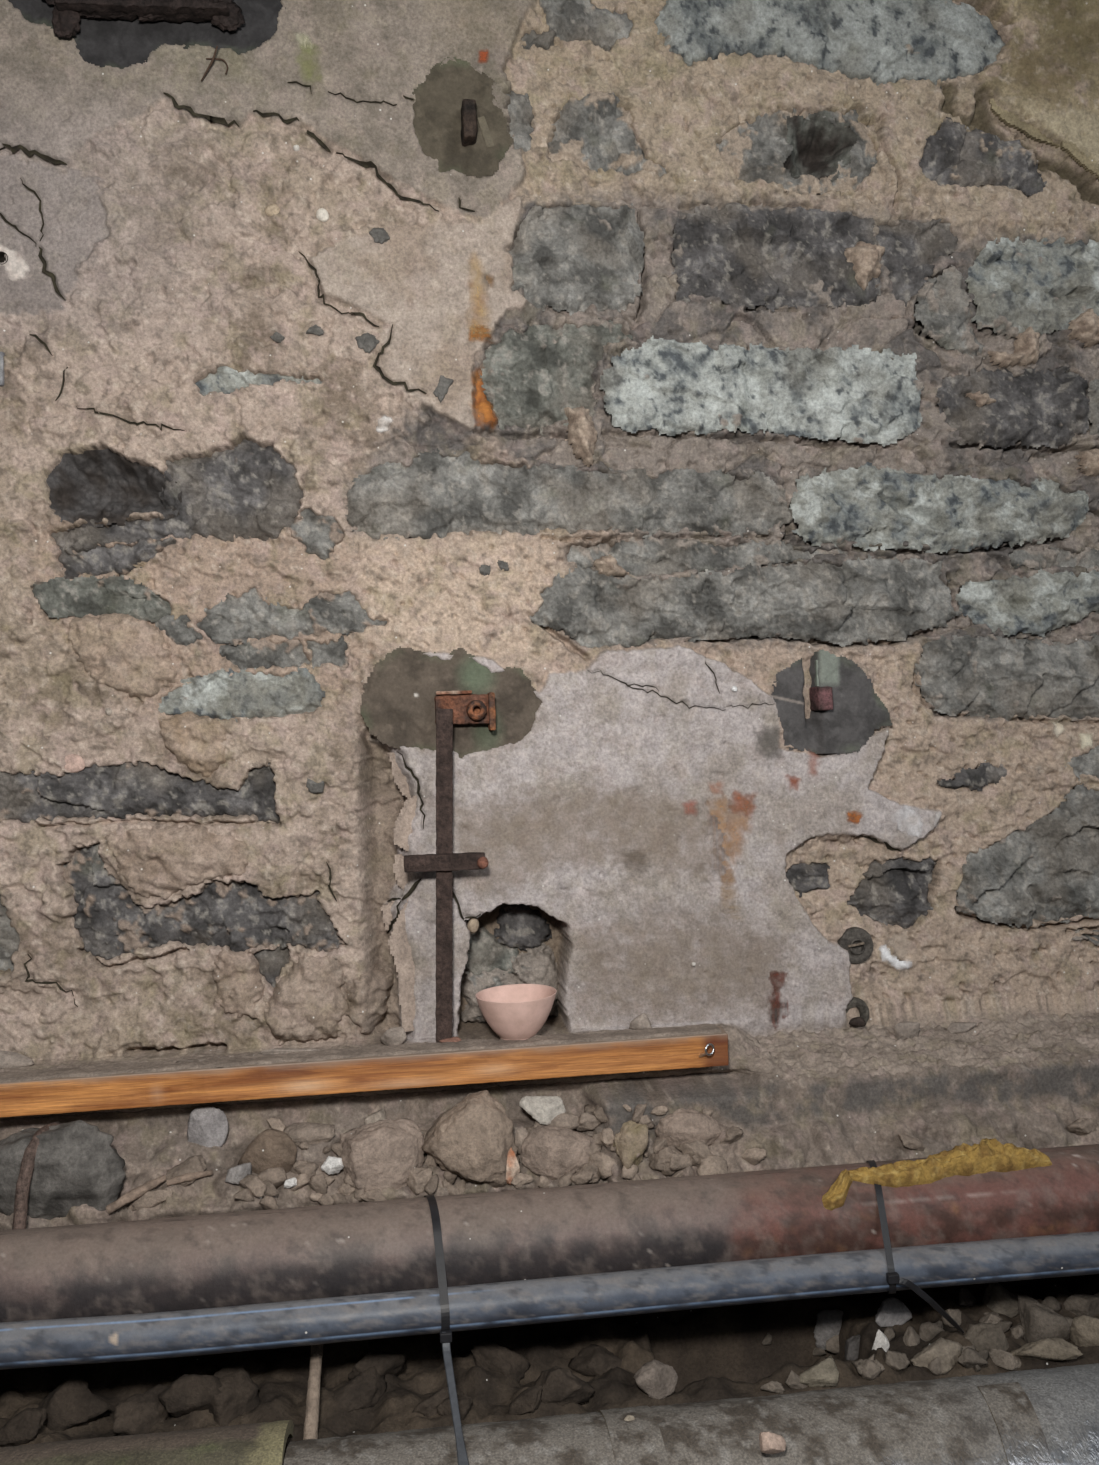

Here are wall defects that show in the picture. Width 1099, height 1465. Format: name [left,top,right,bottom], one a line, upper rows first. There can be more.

crack [163,81,475,212]
crack [0,143,67,301]
crack [29,334,185,431]
crack [299,252,427,394]
corrosion [470,276,492,340]
corrosion [474,370,496,424]
spalling [480,99,1099,449]
spalling [30,439,1099,755]
spalling [63,843,347,988]
spalling [360,646,559,1046]
corrosion [686,793,754,880]
corrosion [770,971,788,1024]